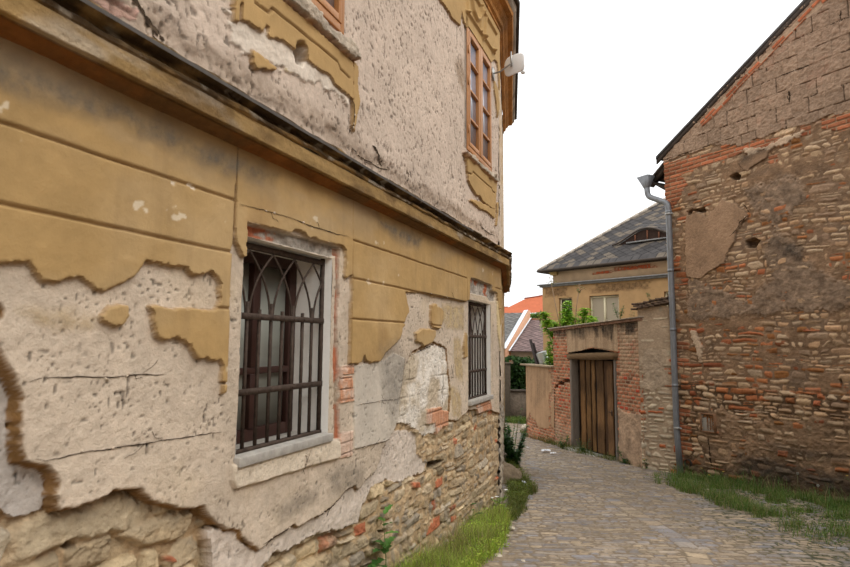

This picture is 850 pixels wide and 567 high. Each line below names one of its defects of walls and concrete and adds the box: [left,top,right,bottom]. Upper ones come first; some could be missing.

spalling [93,0,140,21]
peeling [243,0,355,98]
spalling [663,137,781,203]
peeling [685,199,749,278]
crack [32,360,162,381]
peeling [0,151,501,567]
crack [40,430,219,461]